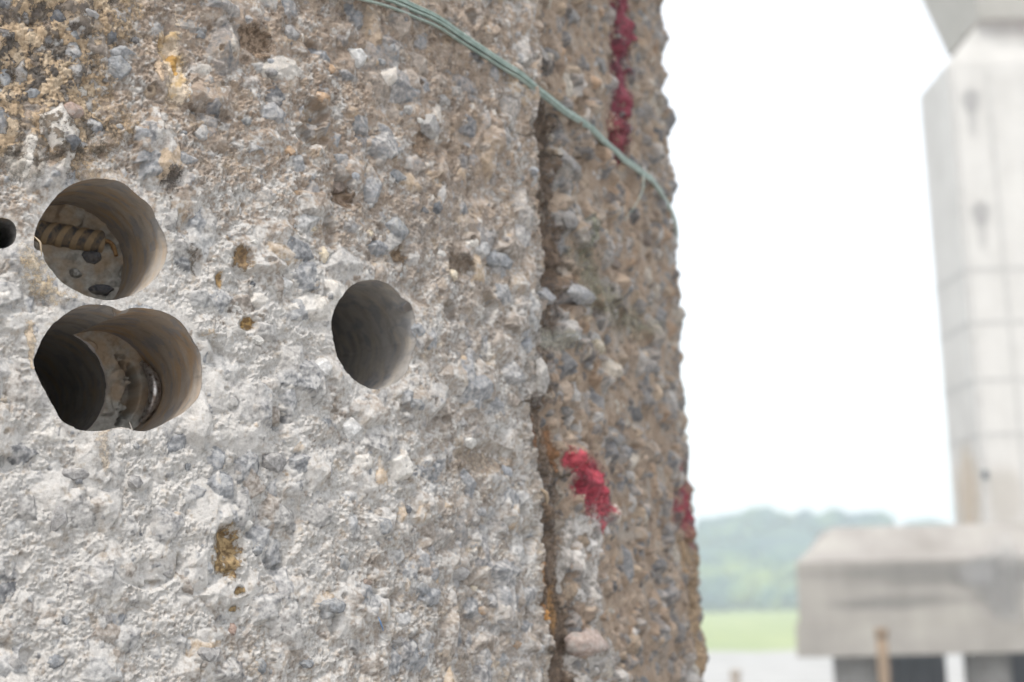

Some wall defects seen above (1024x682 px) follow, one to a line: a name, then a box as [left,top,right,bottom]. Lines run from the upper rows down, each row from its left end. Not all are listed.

corrosion [540,562,557,637]
crack [517,20,586,682]